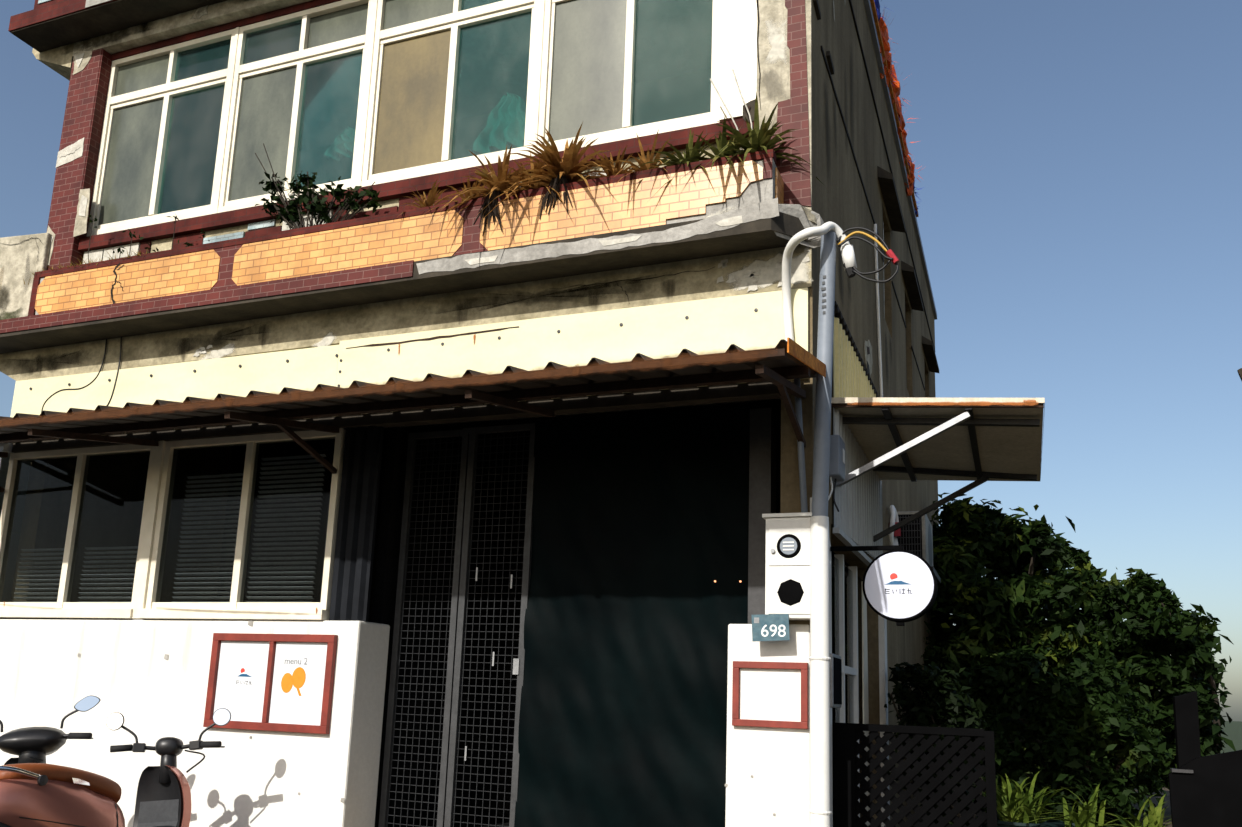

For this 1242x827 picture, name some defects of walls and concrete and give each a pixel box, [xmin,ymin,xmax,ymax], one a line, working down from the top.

peeling [743,0,789,130]
spalling [416,185,824,292]